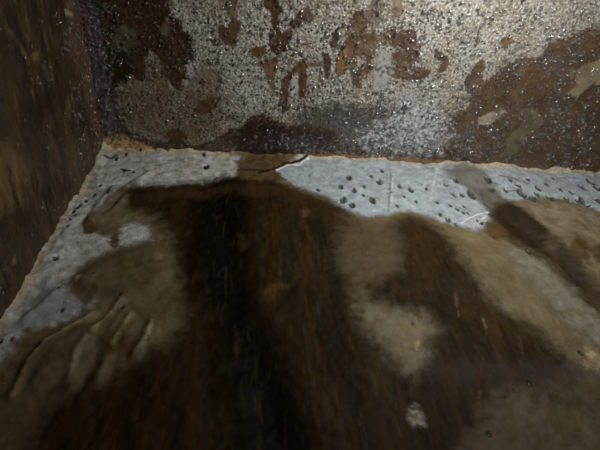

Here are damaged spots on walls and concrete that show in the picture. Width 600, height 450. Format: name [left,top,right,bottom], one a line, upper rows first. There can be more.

damp [0,142,29,214]
damp [7,250,47,309]
crack [240,154,310,173]
damp [23,155,600,450]
corrosion [90,0,600,173]
damp [296,93,600,345]